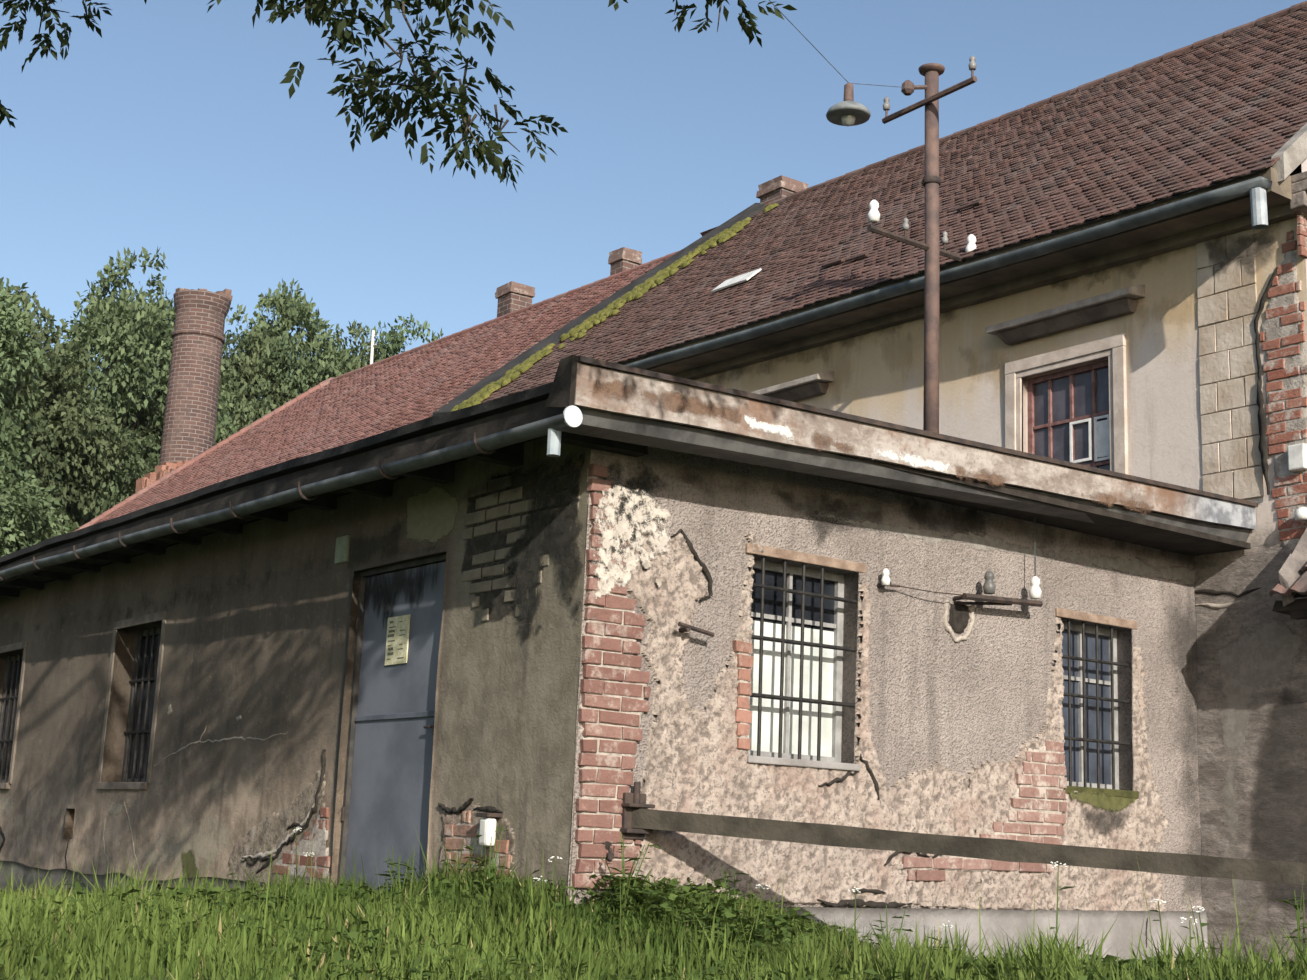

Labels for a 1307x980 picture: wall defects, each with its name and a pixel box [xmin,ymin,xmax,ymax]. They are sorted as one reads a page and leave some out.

crack [1254,267,1278,495]
flaking render [1259,211,1307,551]
crack [241,750,326,874]
flaking render [439,803,515,881]
flaking render [462,457,1169,914]
leakage [1253,690,1307,863]